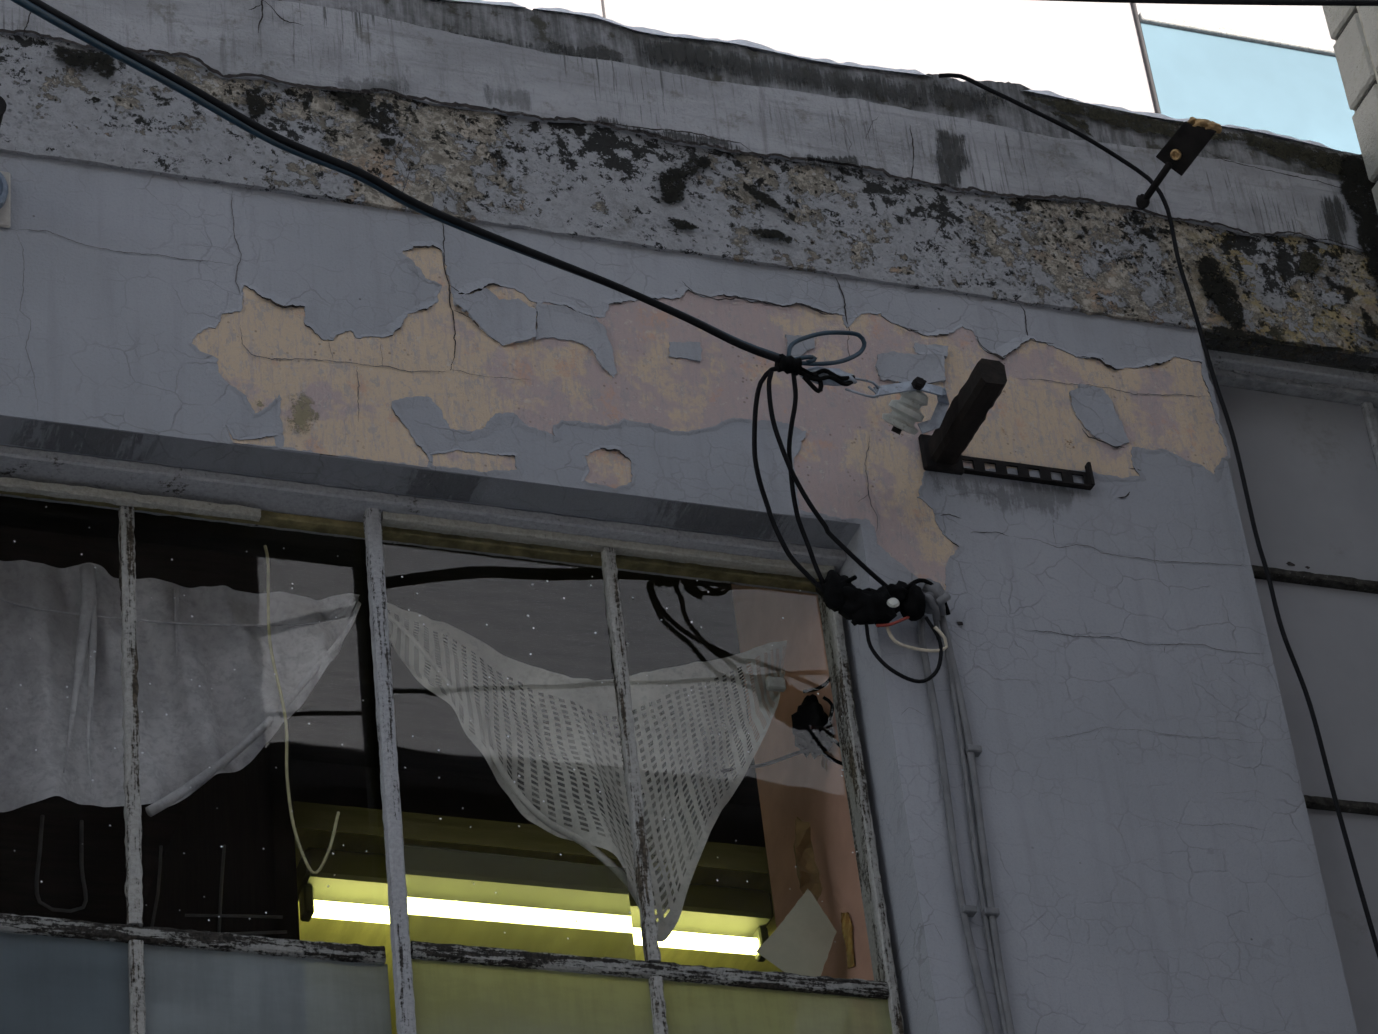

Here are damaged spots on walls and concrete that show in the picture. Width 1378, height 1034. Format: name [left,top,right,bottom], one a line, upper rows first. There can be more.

water stain [54,45,116,79]
water stain [245,86,266,115]
water stain [329,91,376,125]
water stain [442,30,1006,113]
water stain [597,116,740,230]
water stain [936,130,970,188]
water stain [743,182,796,244]
water stain [1321,156,1378,283]
water stain [1193,252,1378,374]
peeling [188,240,1231,593]
crack [940,514,1247,566]
crack [1013,628,1260,654]